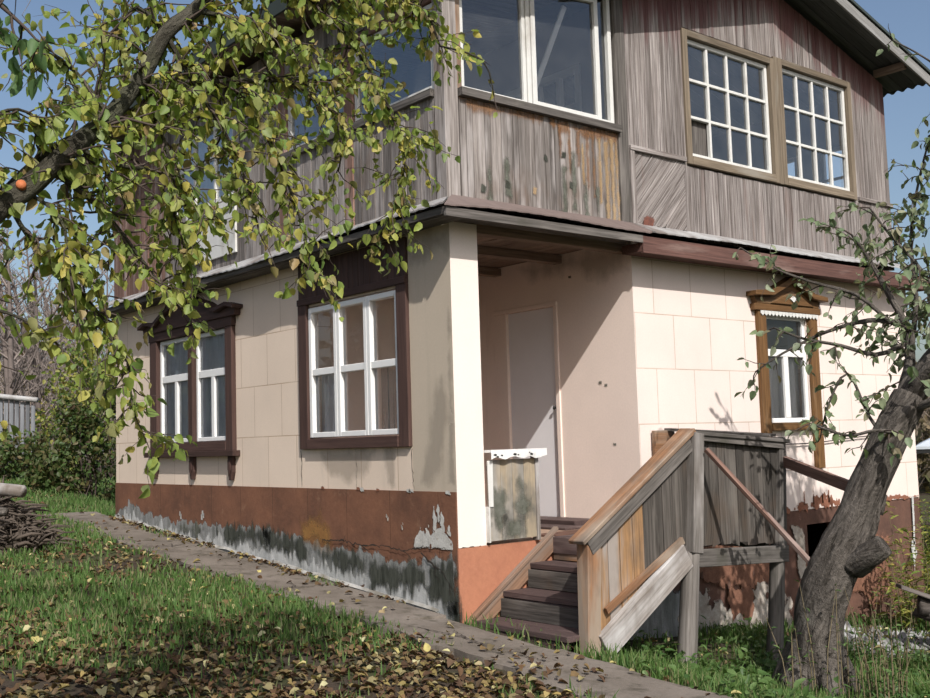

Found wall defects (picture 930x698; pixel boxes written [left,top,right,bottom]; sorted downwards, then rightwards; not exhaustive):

flaking render [115,499,457,621]
water stain [216,520,463,623]
flaking render [698,563,769,634]
peeling [784,594,793,627]
peeling [791,525,806,578]
peeling [852,558,894,610]